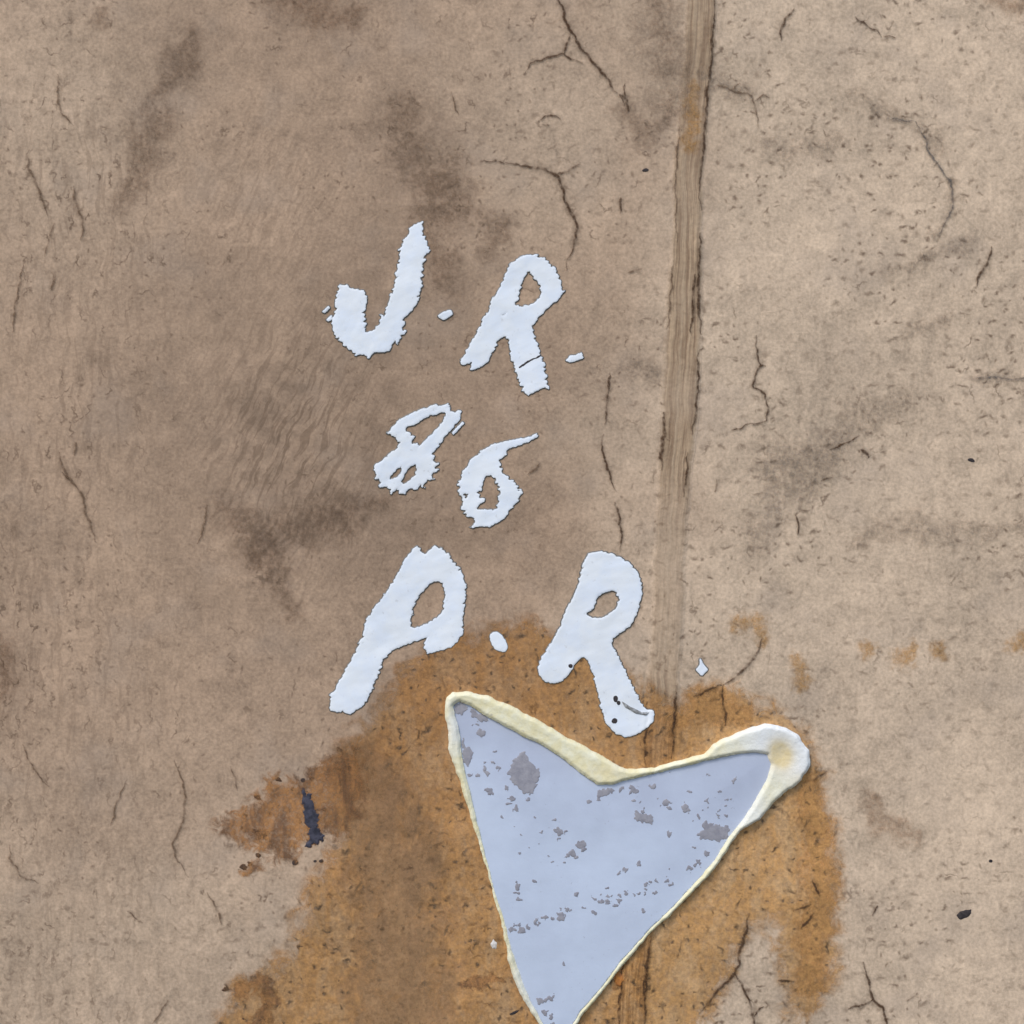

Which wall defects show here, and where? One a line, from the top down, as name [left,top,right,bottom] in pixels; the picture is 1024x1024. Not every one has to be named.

crack [525,0,629,111]
crack [484,160,579,267]
crack [659,1,769,494]
crack [601,375,623,543]
peeling [454,702,489,737]
crack [643,639,762,764]
peeling [462,738,540,818]
rust [215,620,843,1024]
peeling [547,840,587,863]
peeling [508,868,674,933]
peeling [587,783,733,873]
crack [849,962,888,1024]